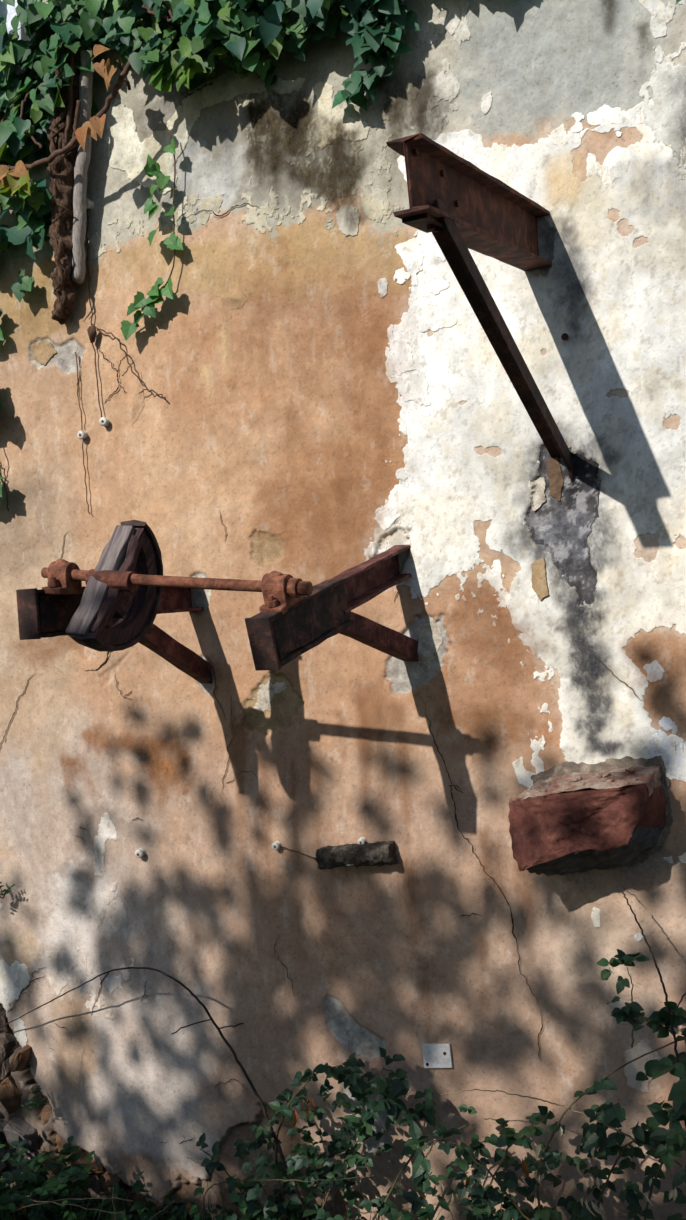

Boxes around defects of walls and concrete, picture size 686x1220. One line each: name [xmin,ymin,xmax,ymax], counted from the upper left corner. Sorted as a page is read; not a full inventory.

water stain [247,92,364,210]
peeling [85,216,144,260]
spalling [29,338,85,375]
peeling [105,0,686,788]
water stain [519,503,622,755]
crack [418,686,544,1060]
peeling [0,957,30,1048]
spalling [324,995,386,1059]